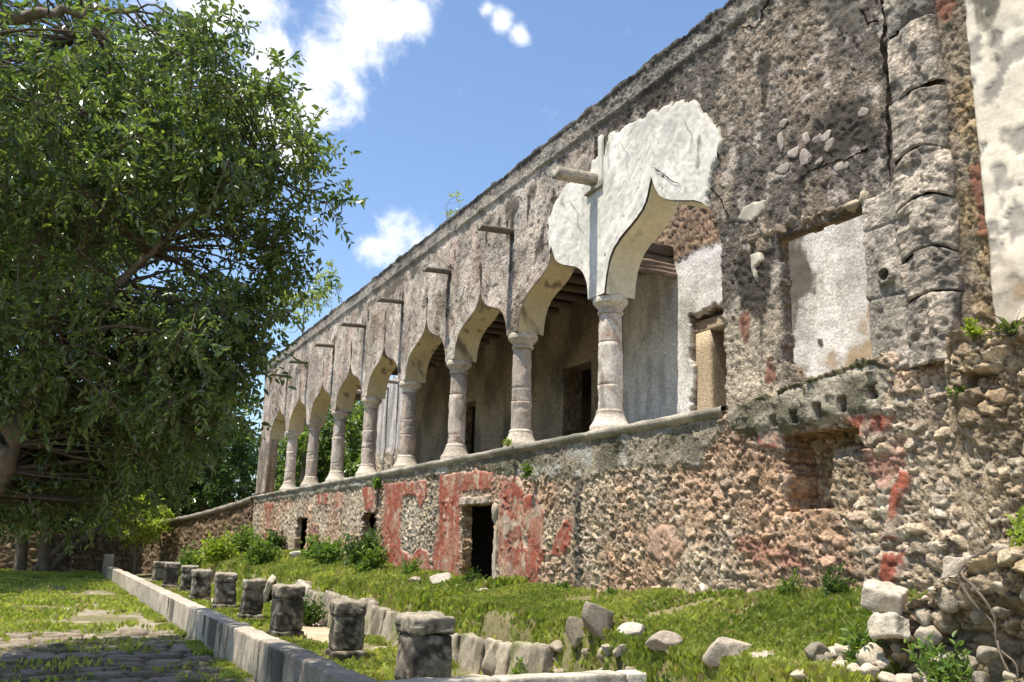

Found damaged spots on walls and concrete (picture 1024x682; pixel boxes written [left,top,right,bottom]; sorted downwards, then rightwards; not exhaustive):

spalling [777,118,849,174]
crack [791,0,892,188]
peeling [362,469,575,583]